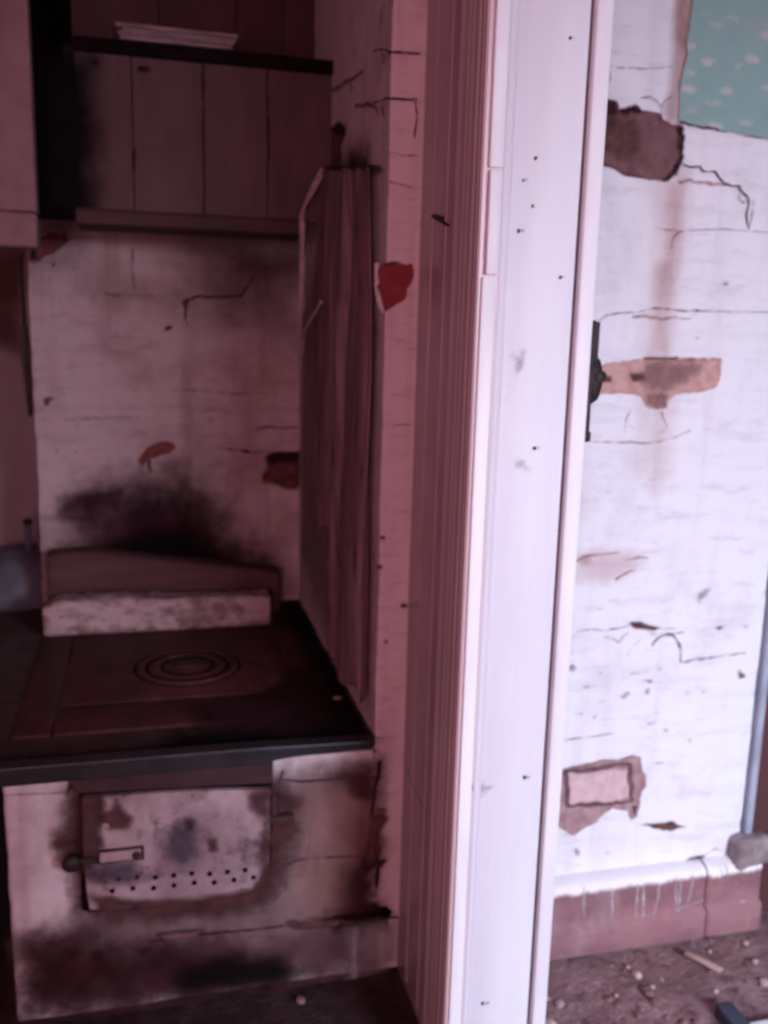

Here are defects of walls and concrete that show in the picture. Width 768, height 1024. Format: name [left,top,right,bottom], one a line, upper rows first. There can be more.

crack [330,48,420,157]
flaking render [603,99,685,181]
crack [663,164,762,238]
crack [182,276,254,324]
flaking render [375,261,414,313]
flaking render [600,358,722,409]
flaking render [262,451,300,490]
damp [65,492,113,511]
damp [118,510,218,560]
crack [585,622,746,663]
flaking render [559,755,684,836]
damp [182,957,292,991]